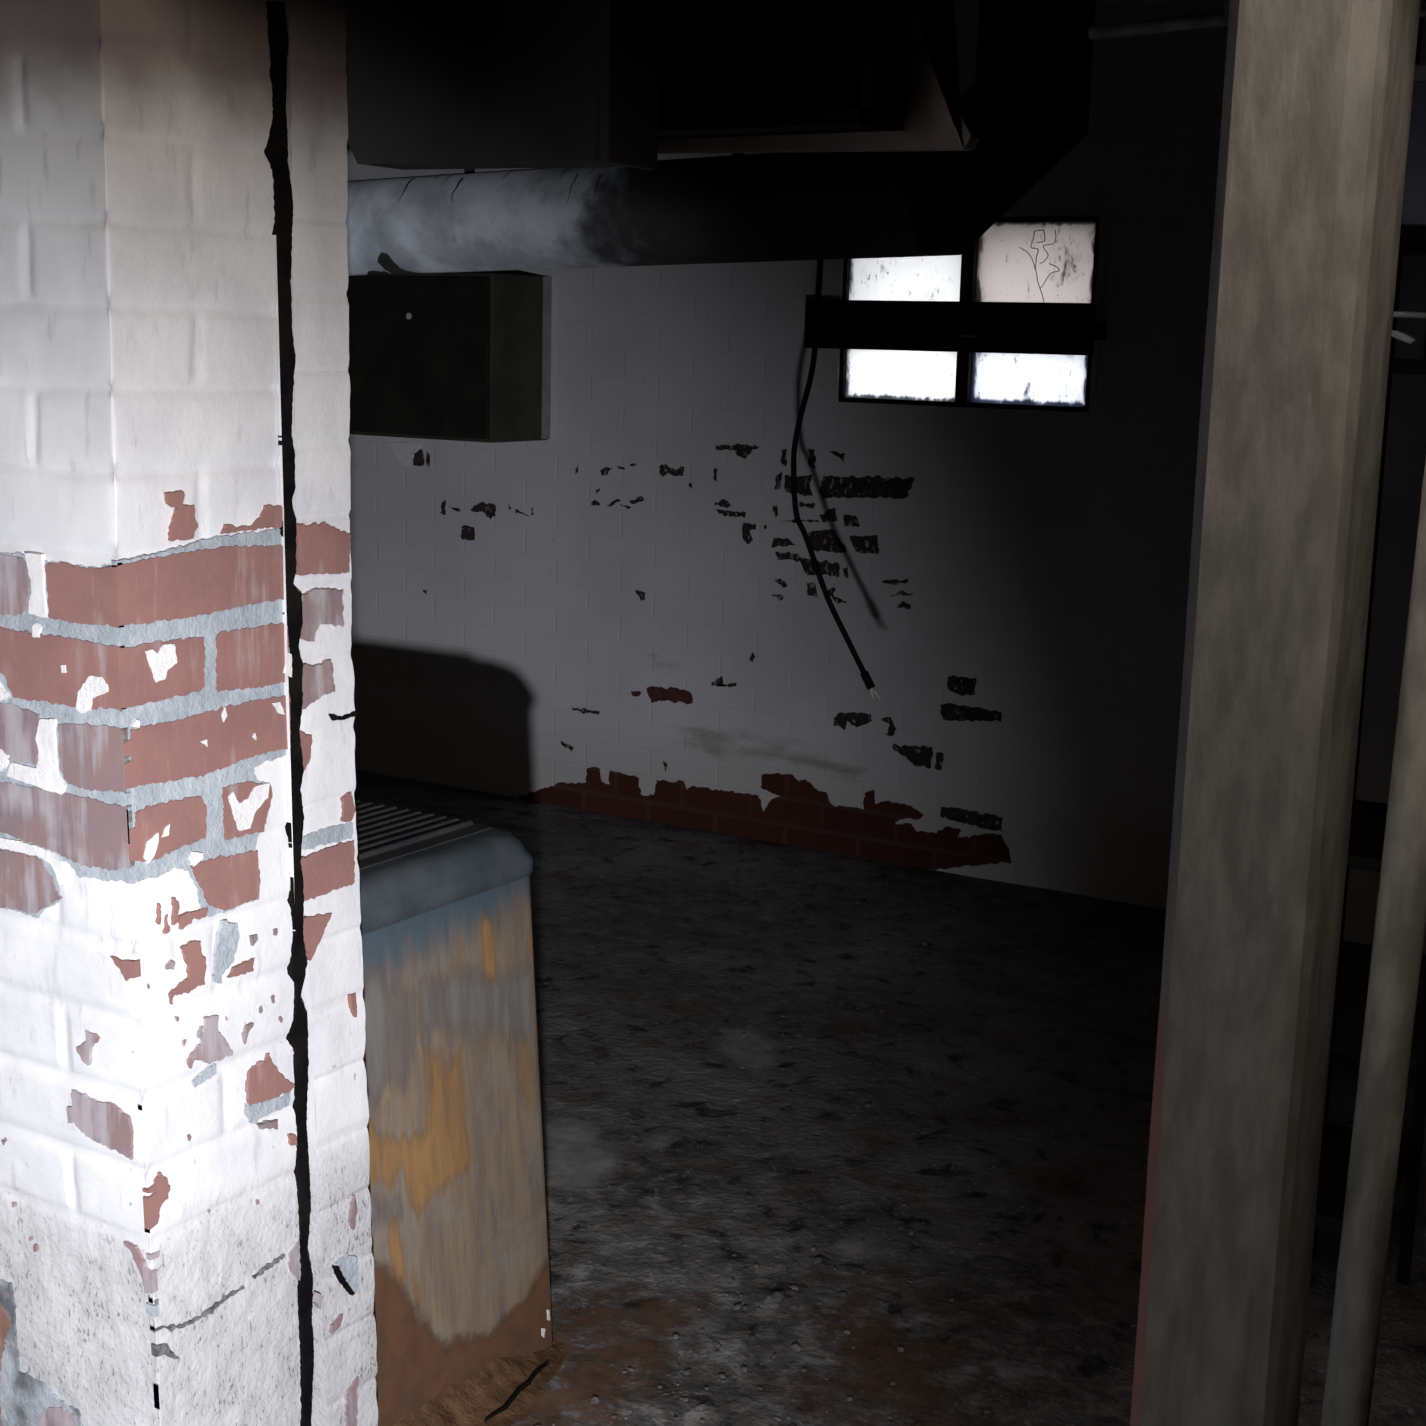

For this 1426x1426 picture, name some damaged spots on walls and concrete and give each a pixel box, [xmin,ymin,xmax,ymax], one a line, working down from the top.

peeling [714,448,914,604]
peeling [0,491,357,1021]
crack [150,1,358,1426]
peeling [631,686,693,704]
peeling [833,712,944,770]
peeling [518,761,1011,870]
peeling [182,995,283,1088]
peeling [66,1089,142,1160]
peeling [243,1053,297,1146]
peeling [123,1172,170,1317]
spalling [332,1253,358,1294]
spalling [0,1279,81,1426]